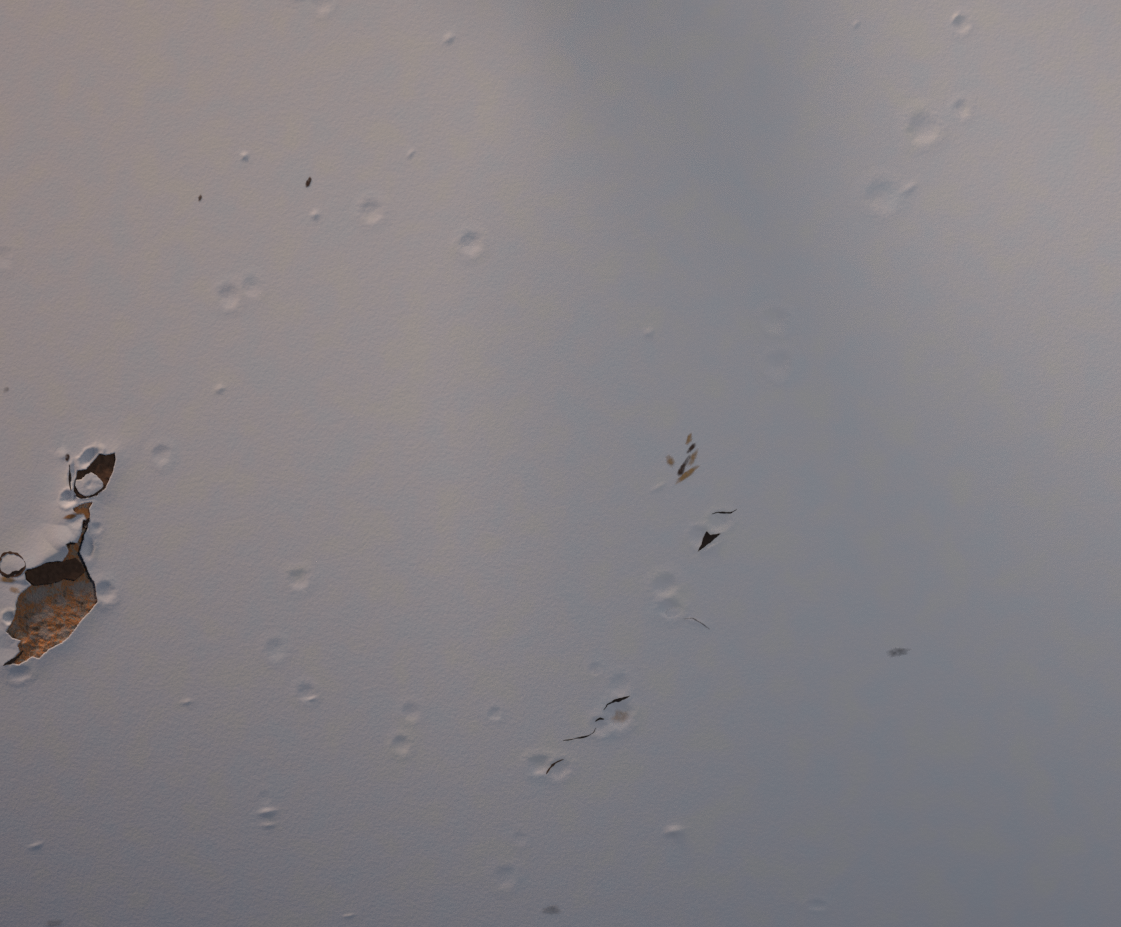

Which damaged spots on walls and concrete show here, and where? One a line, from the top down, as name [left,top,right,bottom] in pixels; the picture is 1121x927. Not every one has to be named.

peeling [0,409,155,707]
peeling [668,434,696,481]